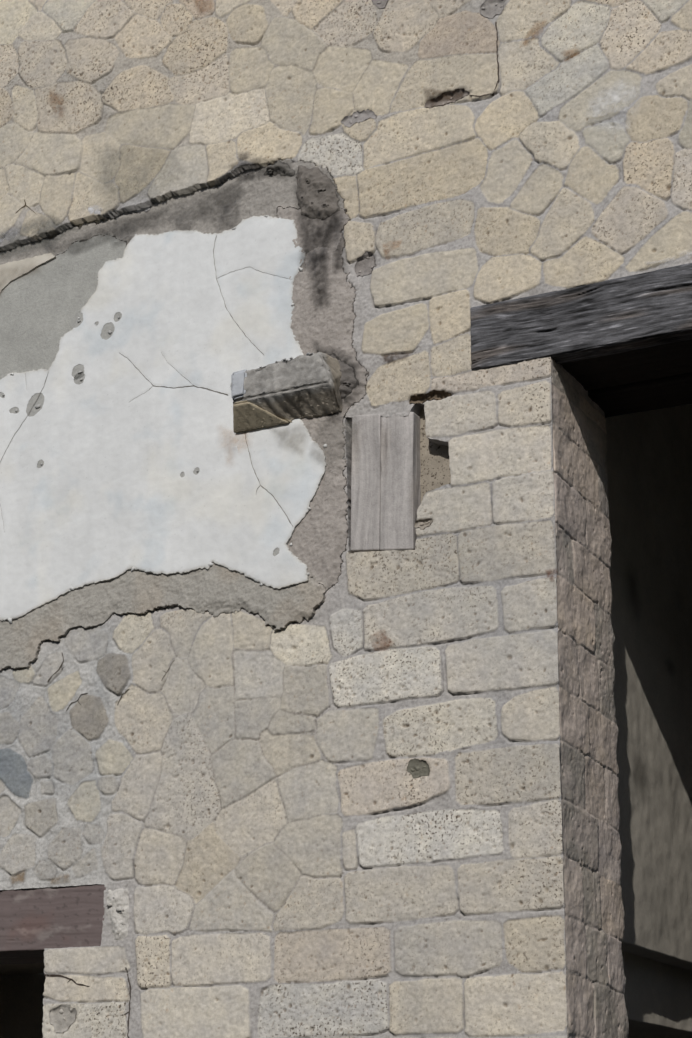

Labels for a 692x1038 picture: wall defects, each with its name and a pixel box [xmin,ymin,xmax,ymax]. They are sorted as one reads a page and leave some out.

spalling [425,88,470,108]
crack [213,235,288,355]
crack [120,353,228,395]
peeling [0,158,376,672]
crack [245,434,293,526]